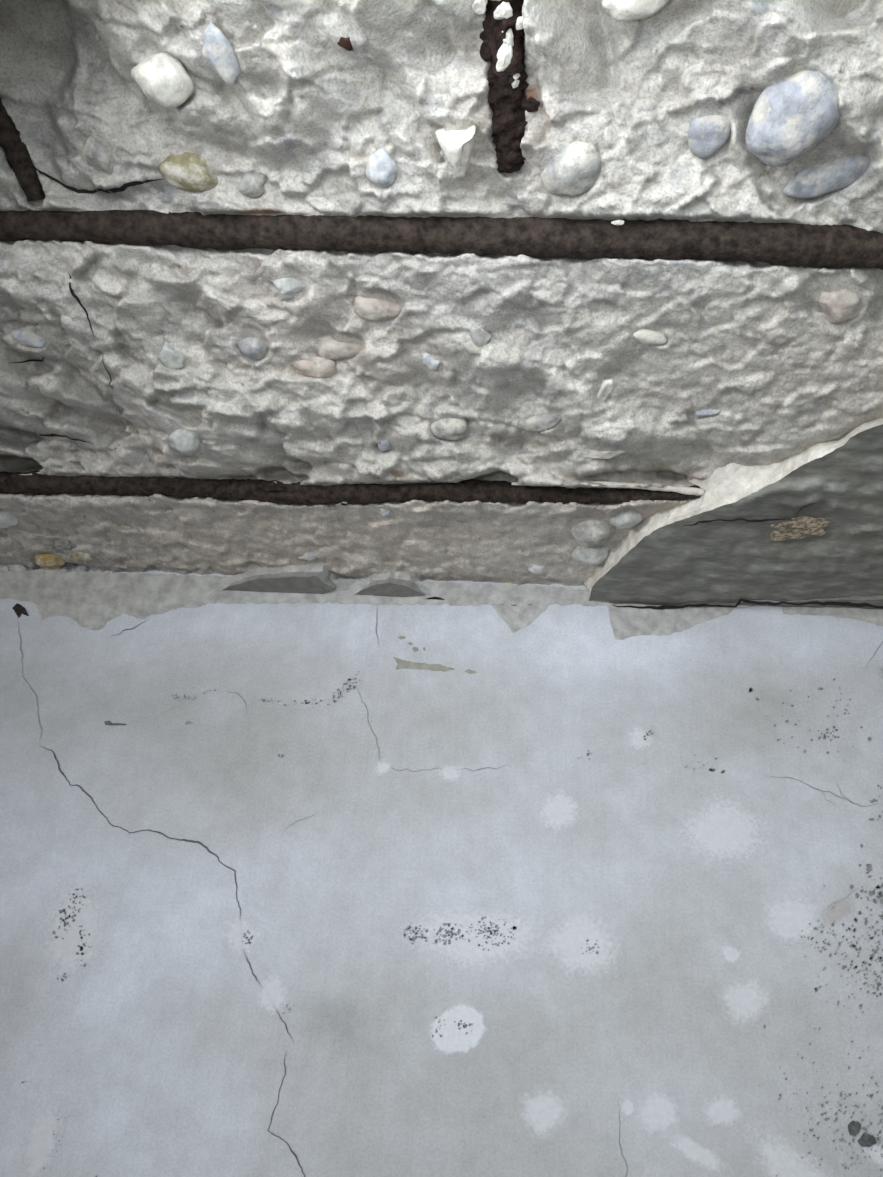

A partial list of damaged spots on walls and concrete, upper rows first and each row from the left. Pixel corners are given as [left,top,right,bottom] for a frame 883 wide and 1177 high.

spalling [0,0,883,233]
rust [480,39,492,62]
rust [514,89,540,139]
spalling [0,239,883,640]
crack [17,620,241,920]
crack [356,686,509,772]
efflorescence [681,799,766,859]
water stain [404,907,613,974]
water stain [765,864,883,1018]
crack [244,951,305,1177]
crack [619,1106,628,1177]
water stain [759,1041,883,1177]